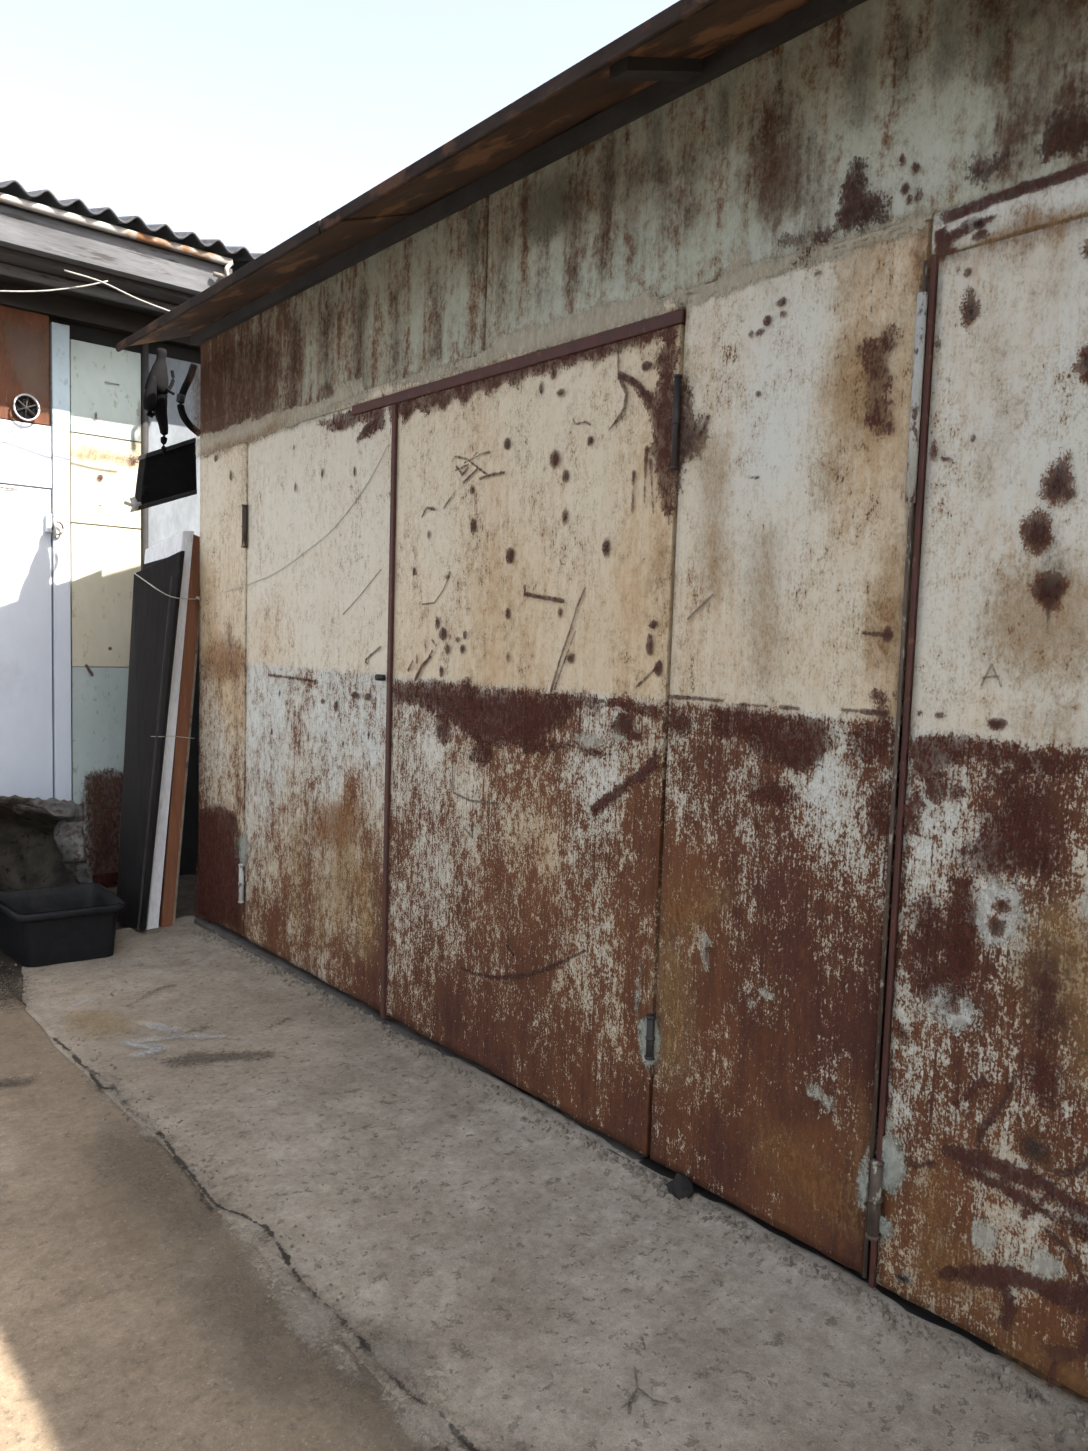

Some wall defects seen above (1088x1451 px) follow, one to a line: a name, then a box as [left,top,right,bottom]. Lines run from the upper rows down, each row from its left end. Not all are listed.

rust [941,0,1088,247]
rust [191,317,301,436]
rust [959,286,986,335]
rust [1070,343,1088,386]
rust [986,449,1088,672]
peeling [268,674,371,712]
peeling [646,620,663,677]
rust [590,748,658,817]
peeling [392,631,1088,1007]
peeling [805,1082,833,1114]
crack [53,1037,480,1451]
rust [938,1127,1088,1333]